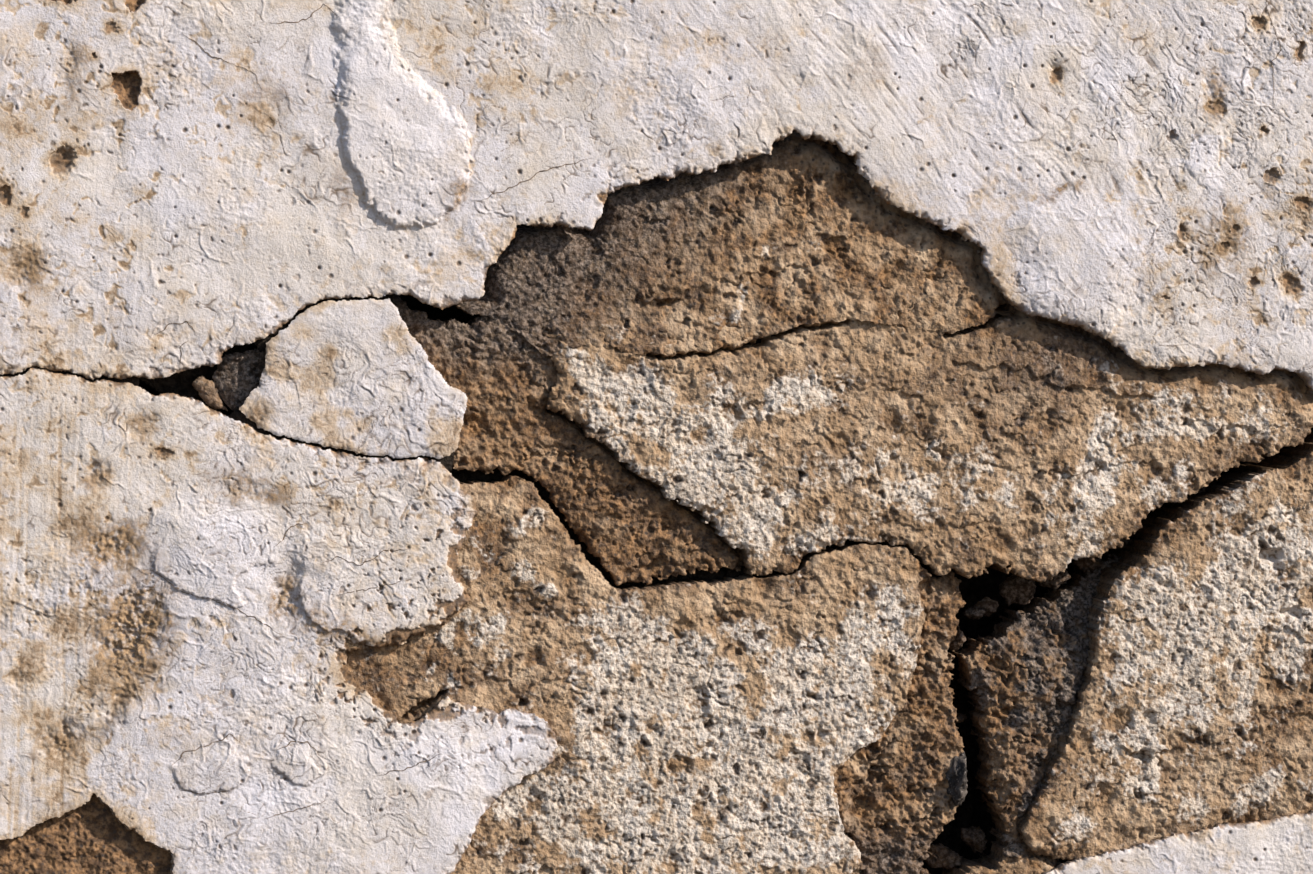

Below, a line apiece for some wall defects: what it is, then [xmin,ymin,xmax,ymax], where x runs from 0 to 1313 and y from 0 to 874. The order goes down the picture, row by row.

spalling [104,21,121,35]
spalling [124,0,146,13]
spalling [144,129,1313,874]
crack [0,294,1131,874]
spalling [0,793,175,874]